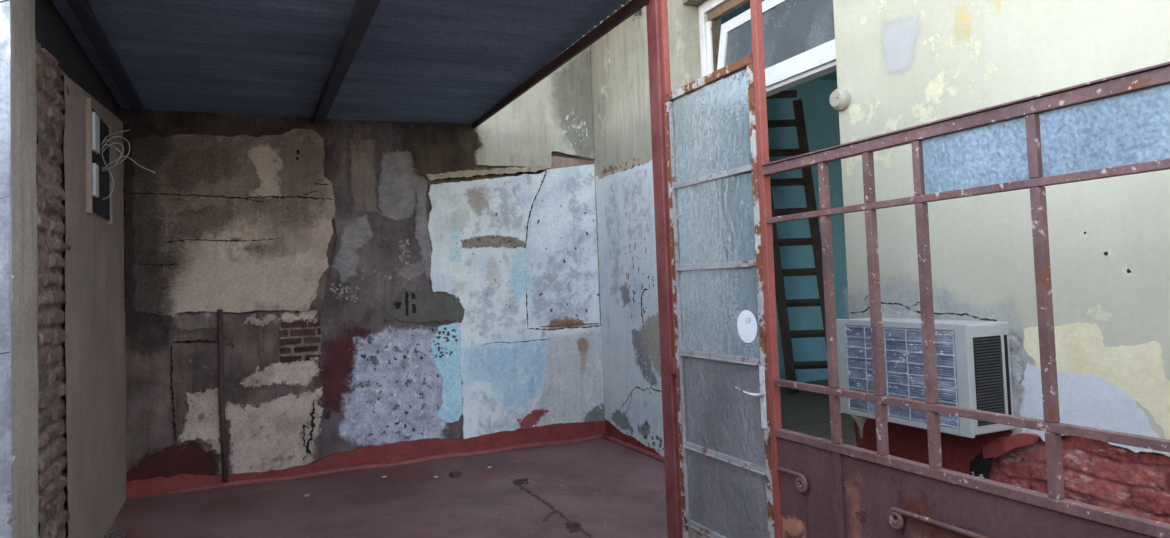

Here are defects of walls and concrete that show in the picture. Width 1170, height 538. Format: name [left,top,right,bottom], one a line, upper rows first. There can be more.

peeling [613,0,646,29]
peeling [840,149,892,182]
flaking render [279,123,664,458]
crack [850,296,997,321]
crack [302,399,316,465]
flaking render [988,326,1048,494]
flaking render [1054,304,1170,524]